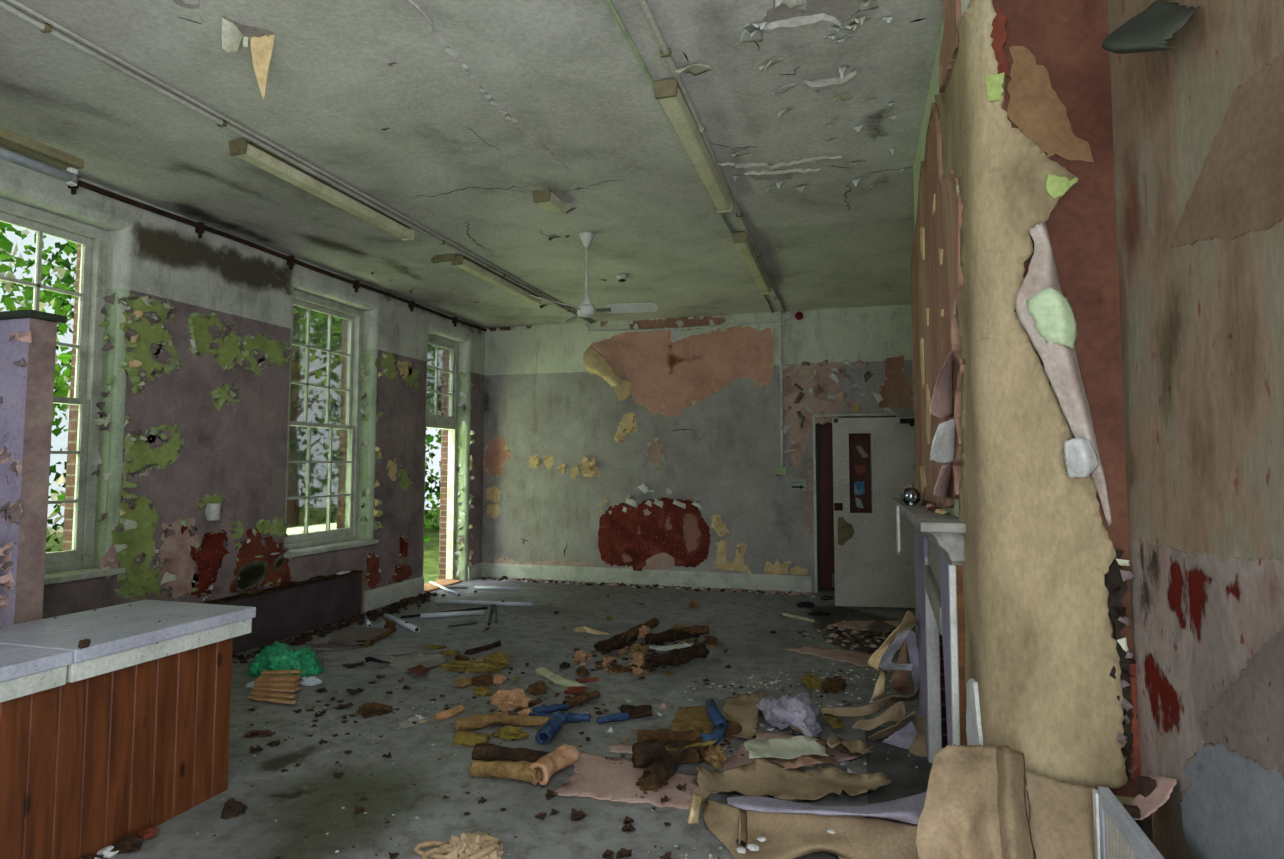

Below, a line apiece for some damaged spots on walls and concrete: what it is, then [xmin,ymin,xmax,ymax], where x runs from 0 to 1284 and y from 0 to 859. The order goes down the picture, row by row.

peeling [221,15,276,100]
crack [407,0,625,191]
peeling [740,0,893,44]
damp [135,224,291,295]
damp [179,205,269,241]
crack [411,186,526,253]
peeling [583,314,894,468]
peeling [92,291,293,602]
peeling [453,372,514,579]
flaking render [489,483,808,576]
flaking render [966,678,983,746]
flaking render [1104,537,1284,859]